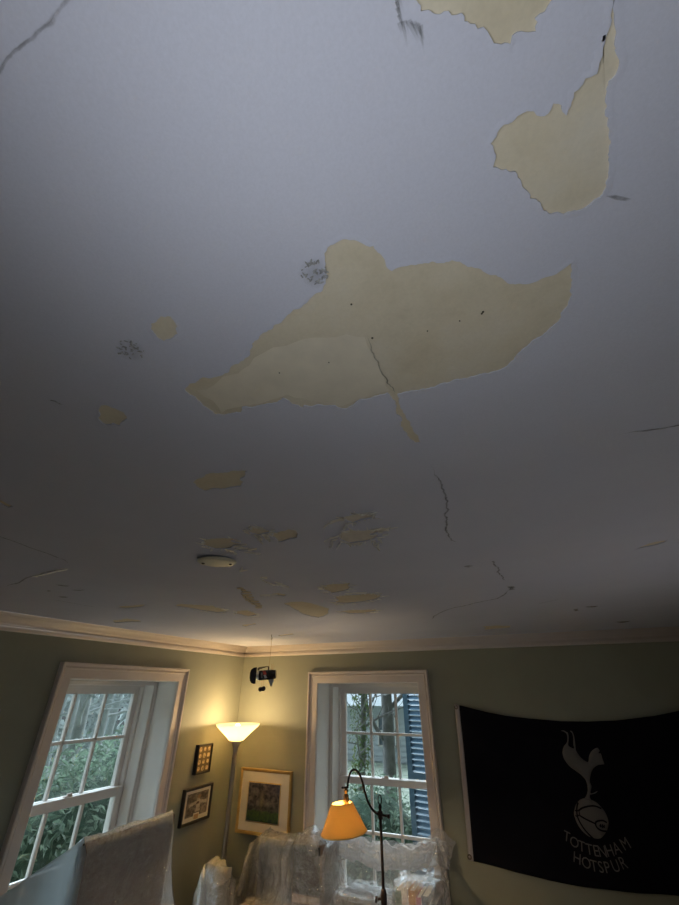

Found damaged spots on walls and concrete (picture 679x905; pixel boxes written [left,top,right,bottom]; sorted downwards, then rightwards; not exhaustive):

peeling [406,0,561,55]
peeling [484,0,629,220]
peeling [181,234,578,445]
peeling [283,592,385,618]